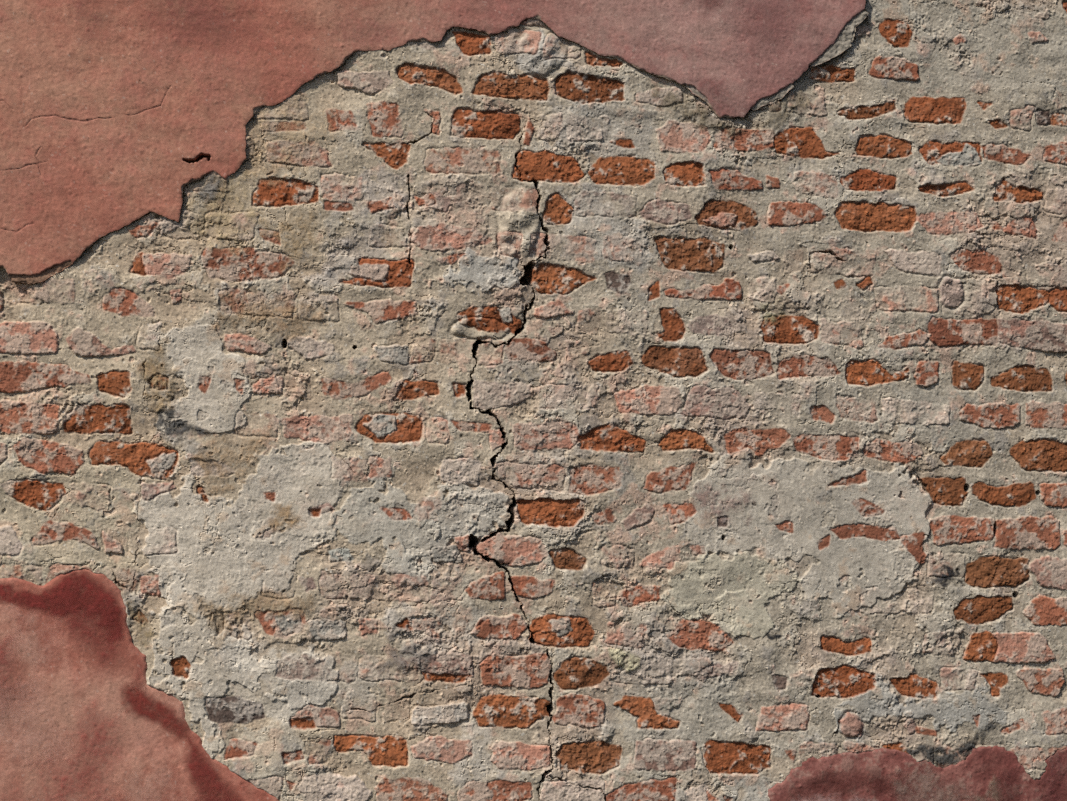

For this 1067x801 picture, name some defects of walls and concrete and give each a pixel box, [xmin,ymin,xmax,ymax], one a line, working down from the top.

peeling [0,0,869,289]
spalling [838,96,967,125]
spalling [654,135,982,274]
spalling [589,308,708,378]
spalling [64,370,179,481]
crack [449,134,607,801]
spalling [517,498,585,528]
spalling [921,439,1067,509]
peeling [0,569,279,801]
spalling [530,614,610,690]
spalling [812,637,876,699]
spalling [954,556,1031,697]